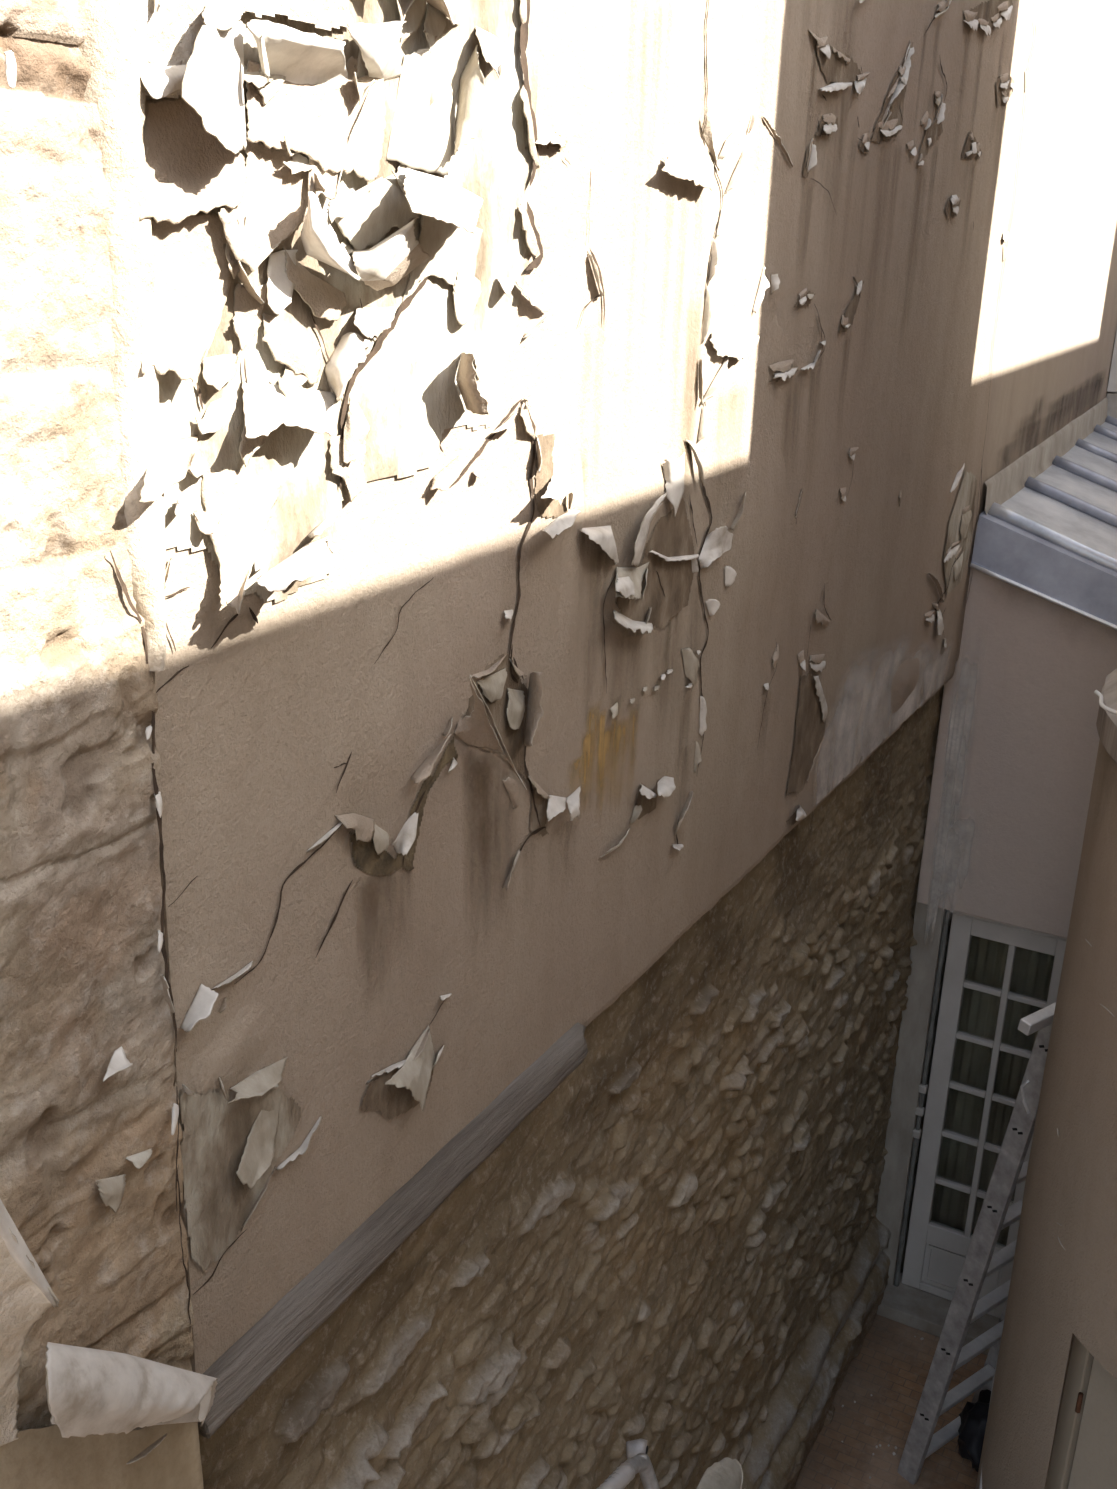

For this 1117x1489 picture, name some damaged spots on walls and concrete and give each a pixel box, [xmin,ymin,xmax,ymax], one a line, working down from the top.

peeling [857,0,1015,166]
peeling [137,0,570,615]
crack [374,577,434,664]
crack [451,399,536,680]
peeling [535,434,694,693]
crack [110,550,352,1052]
peeling [306,644,581,957]
peeling [0,1199,60,1446]
peeling [45,1342,218,1464]
crack [175,1091,191,1327]
peeling [171,1057,322,1295]
peeling [361,993,452,1120]